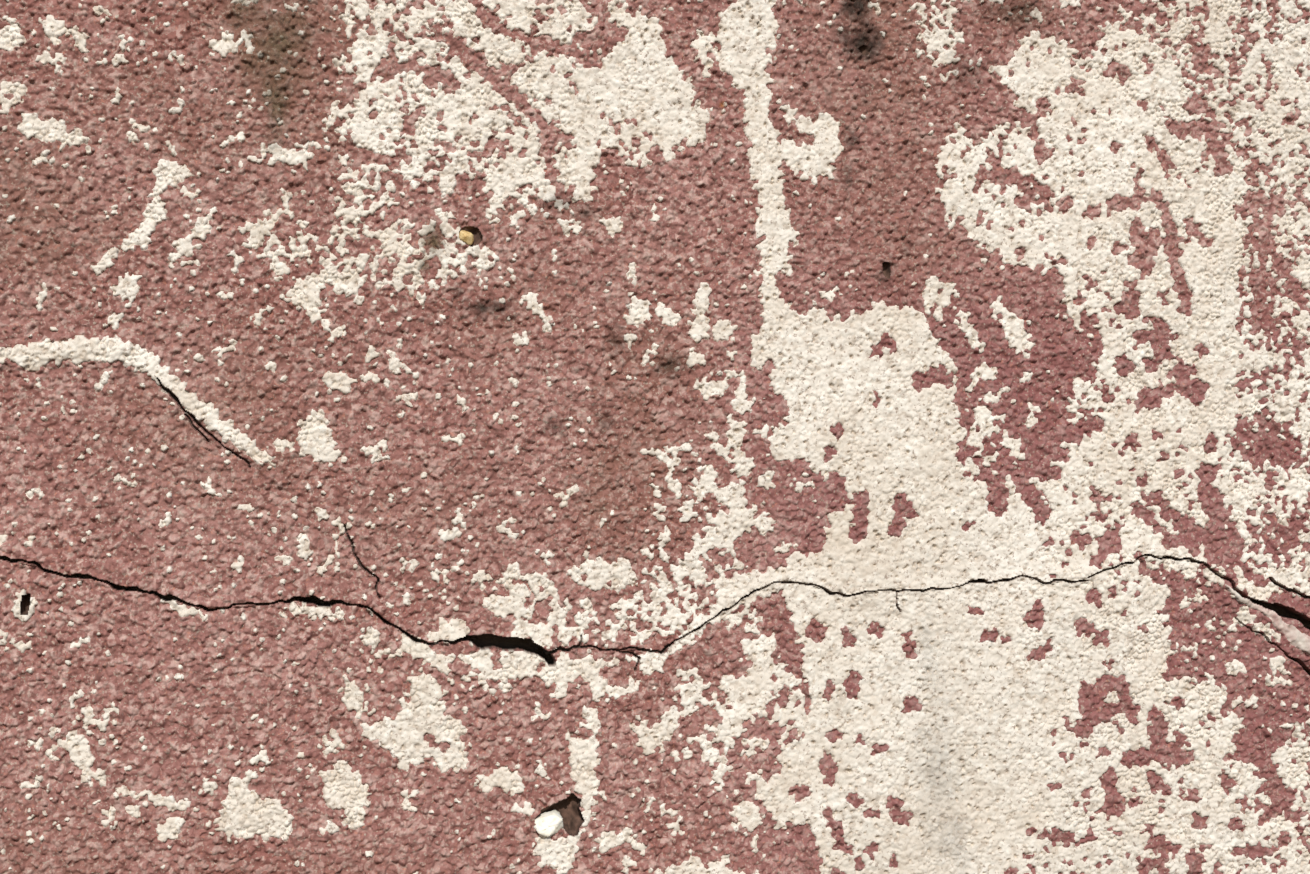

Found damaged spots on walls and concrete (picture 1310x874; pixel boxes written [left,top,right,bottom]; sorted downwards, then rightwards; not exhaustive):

peeling [208,31,244,58]
peeling [227,0,710,343]
peeling [341,0,1310,874]
peeling [296,533,314,561]
peeling [289,602,380,654]
crack [0,524,1310,676]
peeling [318,728,372,835]